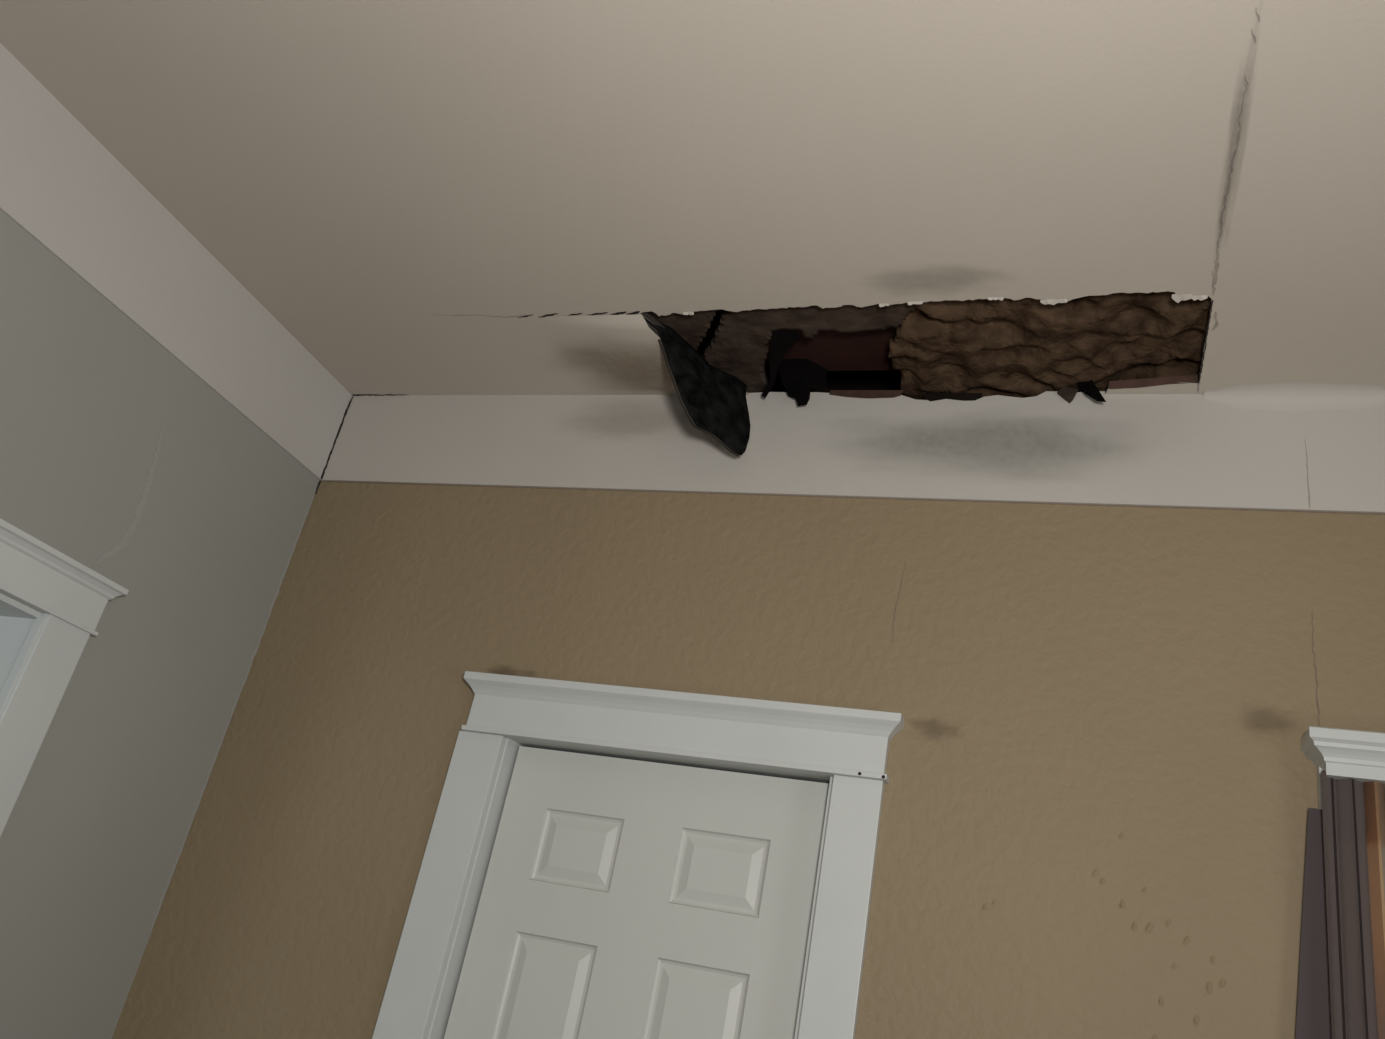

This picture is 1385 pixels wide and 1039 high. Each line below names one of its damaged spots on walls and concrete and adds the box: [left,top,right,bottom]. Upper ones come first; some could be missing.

crack [1197,75,1249,392]
crack [431,310,640,318]
flaking render [879,291,1211,400]
crack [1311,610,1320,727]